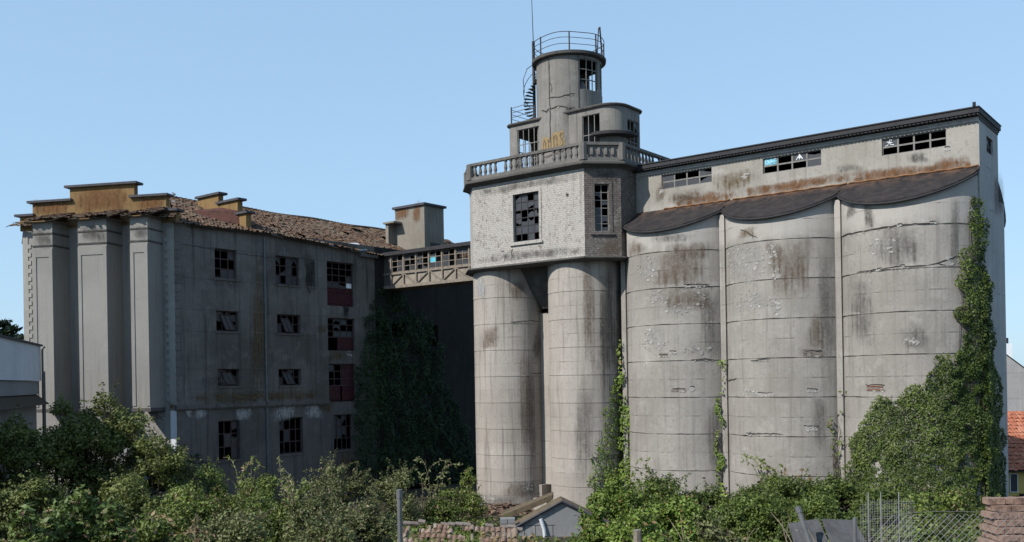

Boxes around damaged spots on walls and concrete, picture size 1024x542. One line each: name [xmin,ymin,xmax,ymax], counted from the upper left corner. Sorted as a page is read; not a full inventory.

crack [541,67,575,137]
corrosion [856,160,970,181]
corrosion [748,177,842,194]
crack [859,255,959,273]
spalling [866,384,886,392]